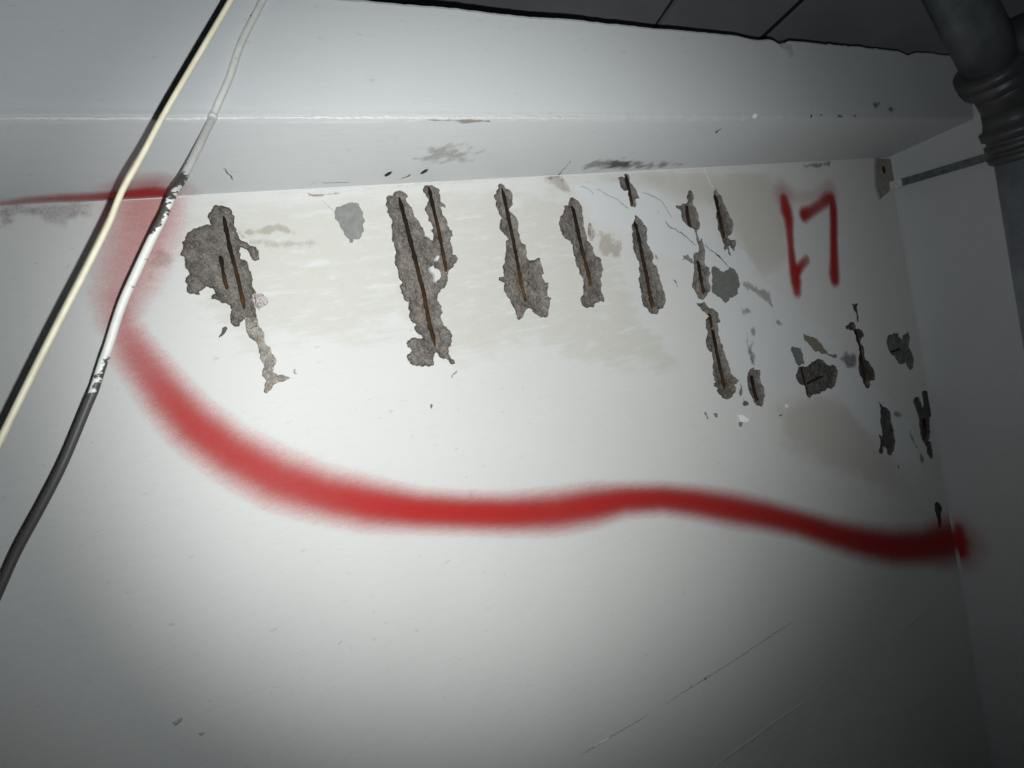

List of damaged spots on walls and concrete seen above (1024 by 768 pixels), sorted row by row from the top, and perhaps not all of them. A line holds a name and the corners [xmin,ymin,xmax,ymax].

spalling [180,204,298,393]
spalling [386,185,458,378]
spalling [494,184,551,320]
spalling [559,197,604,308]
spalling [618,174,678,314]
spalling [676,189,765,427]
spalling [791,334,838,398]
spalling [845,303,875,388]
spalling [879,403,895,456]
spalling [913,391,933,459]